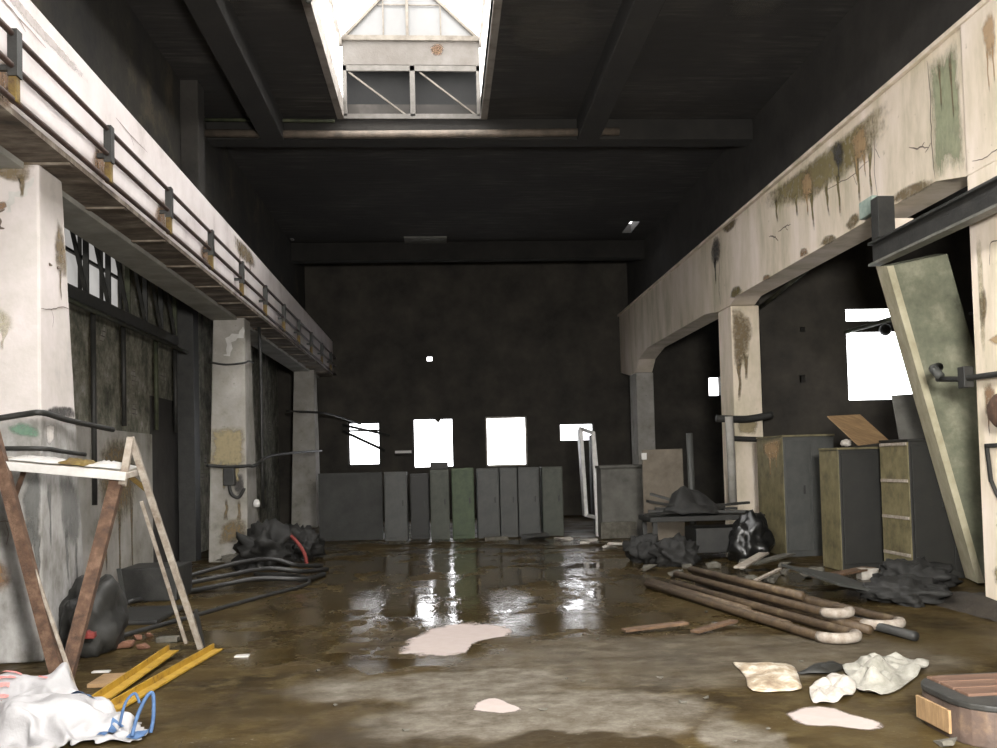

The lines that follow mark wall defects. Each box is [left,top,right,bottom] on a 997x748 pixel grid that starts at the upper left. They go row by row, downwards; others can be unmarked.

corrosion [983,17,995,85]
damp [938,60,954,115]
damp [711,220,735,282]
corrosion [846,214,859,229]
damp [732,311,751,397]